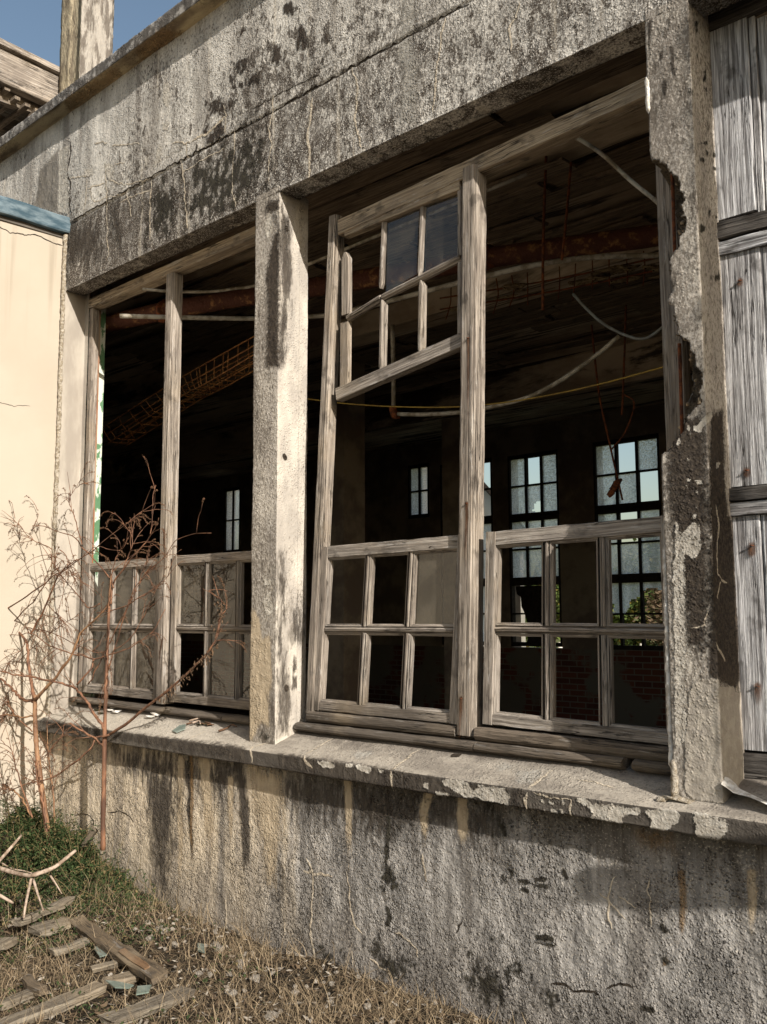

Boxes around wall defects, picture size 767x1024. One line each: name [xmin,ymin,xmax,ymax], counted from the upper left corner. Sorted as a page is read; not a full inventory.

crack [67,4,469,260]
water stain [265,199,292,367]
spalling [652,159,686,276]
spalling [666,315,713,452]
water stain [259,554,304,739]
peeling [672,507,701,751]
water stain [40,718,541,894]
peeling [317,761,383,774]
peeling [423,779,510,806]
peeling [541,798,728,841]
water stain [363,906,418,984]